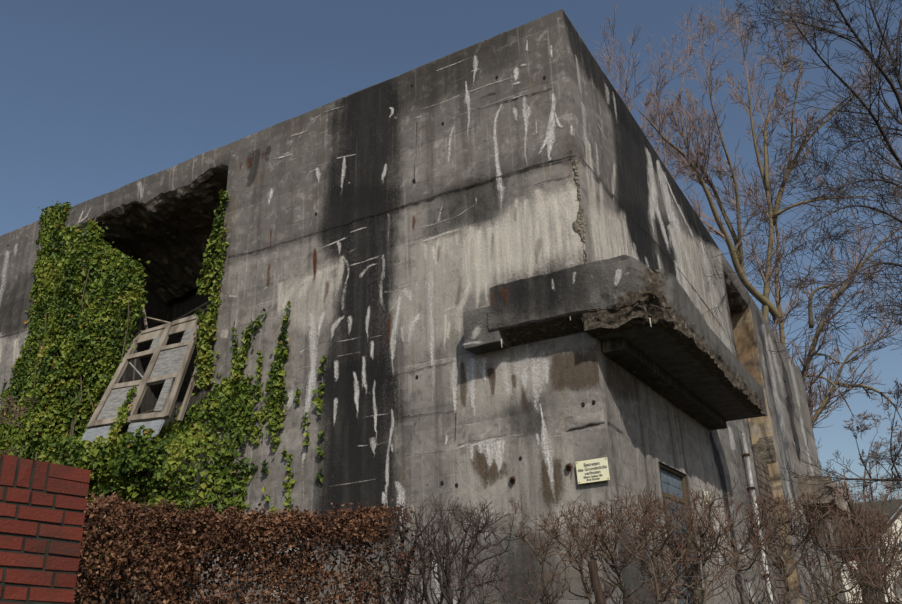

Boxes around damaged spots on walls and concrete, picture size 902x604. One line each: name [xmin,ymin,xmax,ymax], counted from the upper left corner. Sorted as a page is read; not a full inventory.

water stain [278,11,734,547]